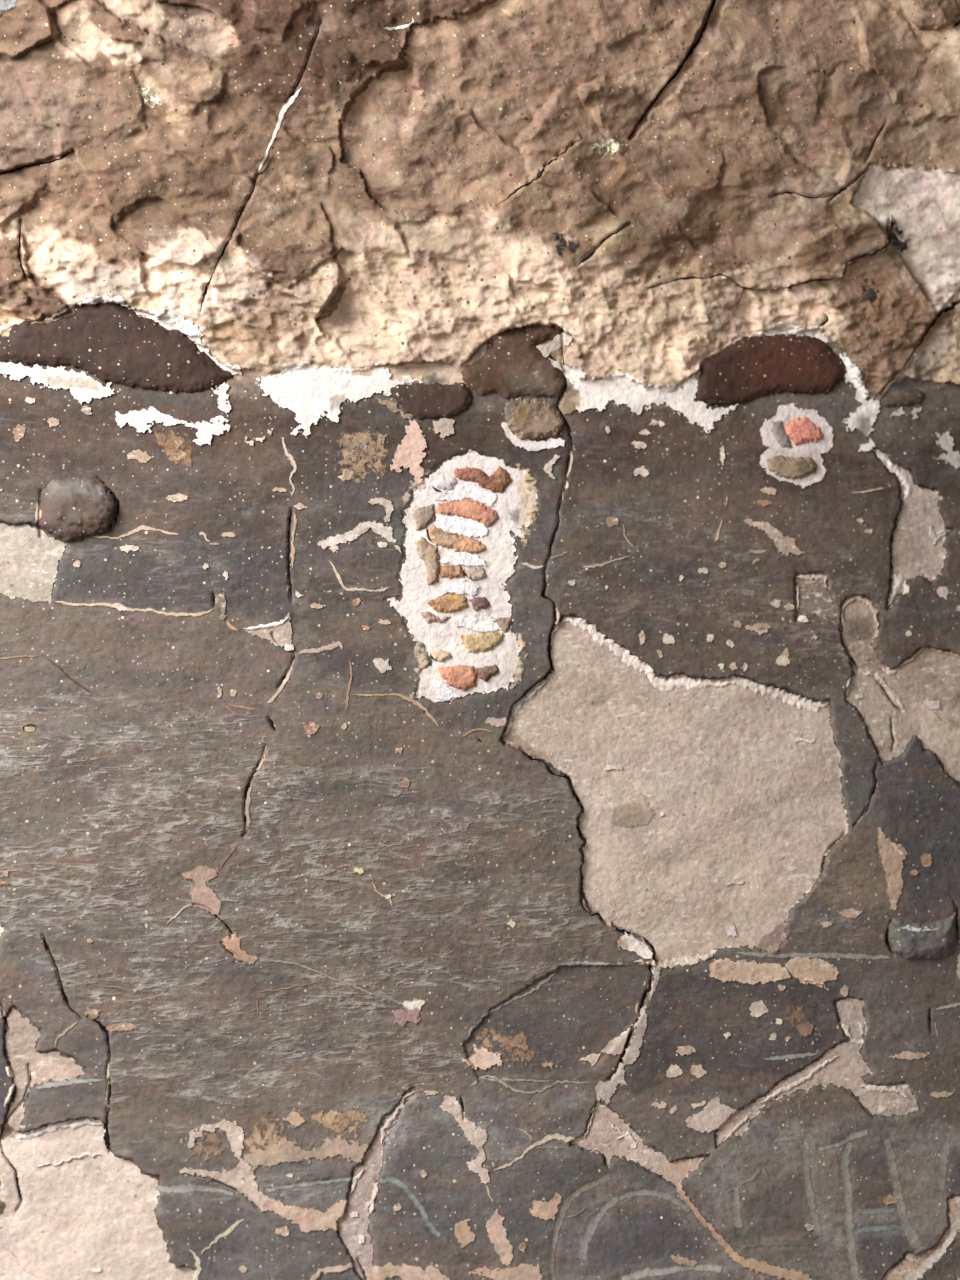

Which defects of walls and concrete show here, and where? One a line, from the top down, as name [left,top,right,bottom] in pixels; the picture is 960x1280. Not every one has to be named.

crack [200,21,322,311]
crack [629,0,719,139]
crack [644,217,890,305]
flaking render [0,523,81,603]
flaking render [203,563,295,688]
flaking render [317,466,512,691]
flaking render [770,449,960,781]
crack [0,1068,35,1276]
crack [6,929,111,1152]
flaking render [0,1005,194,1280]
crack [189,1219,244,1280]
flaking render [167,617,960,1280]